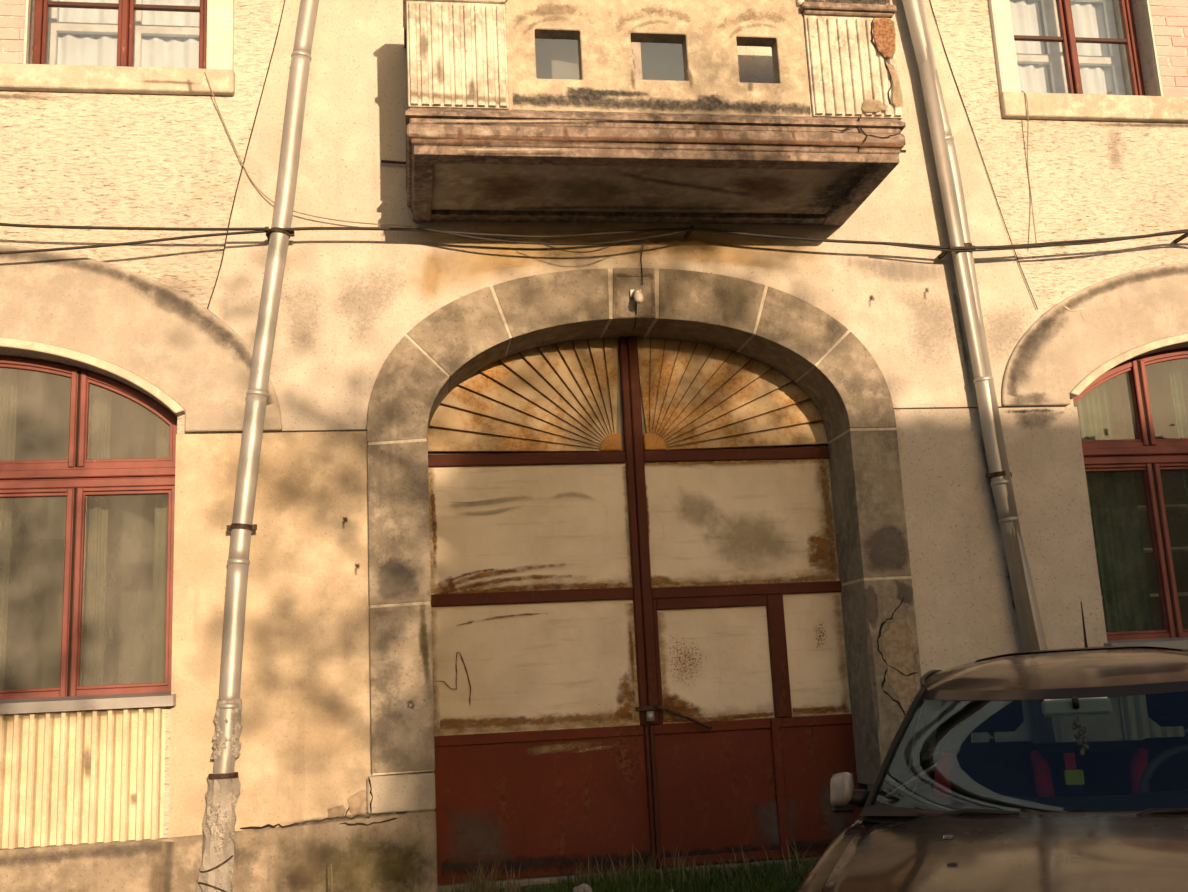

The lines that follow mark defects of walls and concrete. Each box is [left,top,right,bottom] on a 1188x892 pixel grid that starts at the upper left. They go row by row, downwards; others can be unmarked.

flaking render [861,17,903,112]
crack [240,777,408,829]